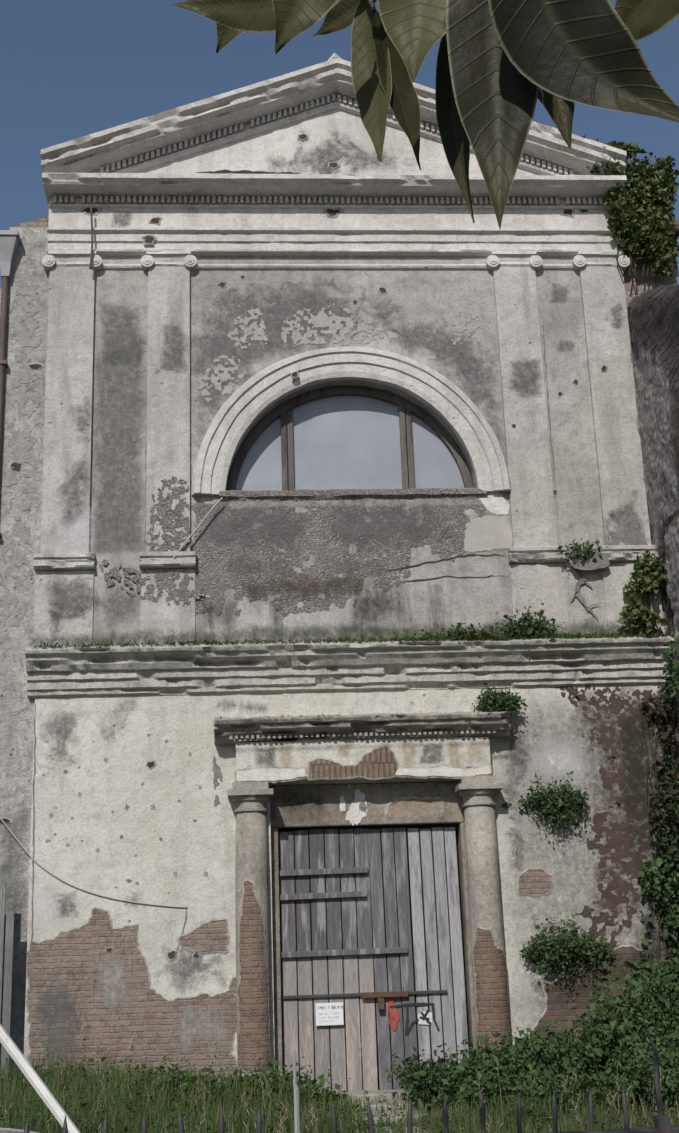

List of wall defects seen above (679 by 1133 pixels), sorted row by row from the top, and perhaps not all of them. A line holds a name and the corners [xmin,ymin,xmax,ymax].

spalling [24,879,271,1085]